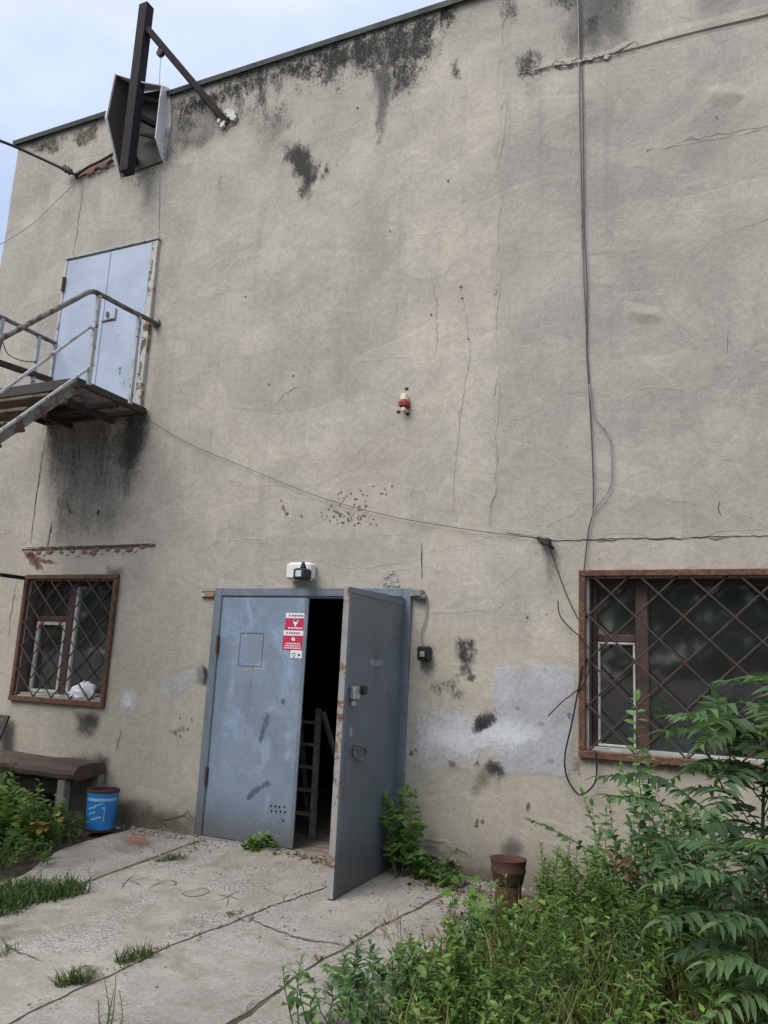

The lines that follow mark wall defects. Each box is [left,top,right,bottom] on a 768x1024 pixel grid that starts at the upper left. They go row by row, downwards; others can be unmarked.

water stain [173,5,454,129]
crack [520,19,767,77]
crack [646,116,768,151]
water stain [285,143,328,198]
spalling [22,543,155,556]
water stain [455,642,477,681]
water stain [472,712,495,732]
water stain [482,760,504,781]